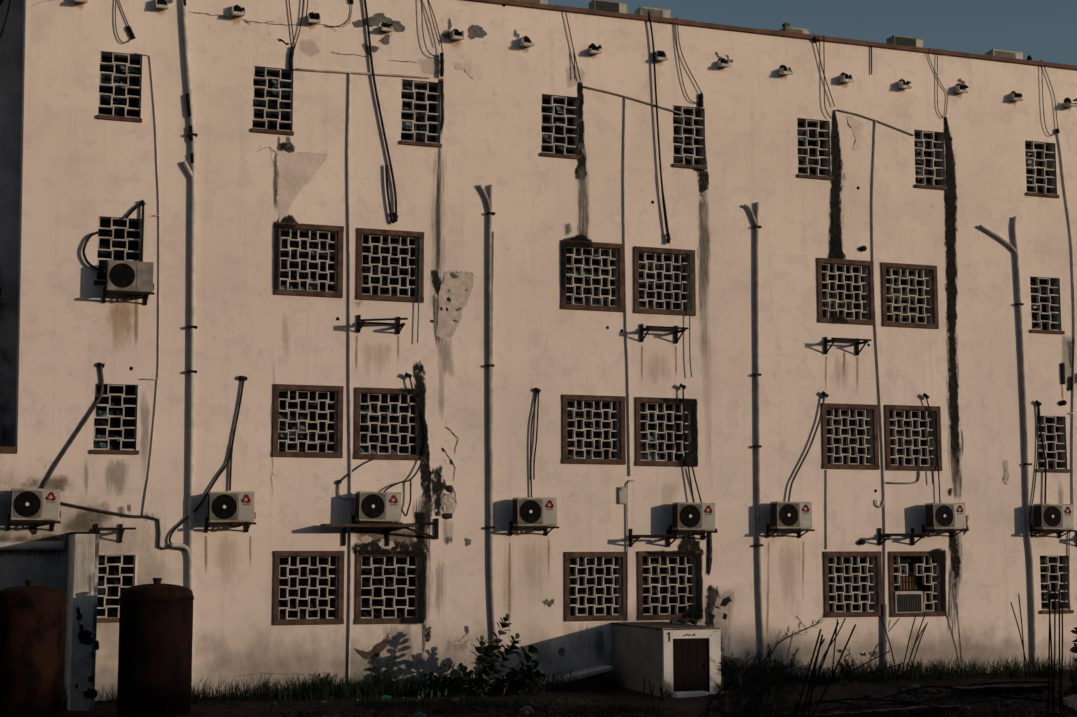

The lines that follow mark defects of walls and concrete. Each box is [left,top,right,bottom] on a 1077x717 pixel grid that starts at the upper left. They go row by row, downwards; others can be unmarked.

spalling [352,12,406,56]
spalling [468,25,488,39]
peeling [275,150,328,222]
water stain [562,82,592,295]
water stain [828,110,846,259]
peeling [431,270,474,339]
water stain [944,117,964,498]
water stain [646,533,712,622]